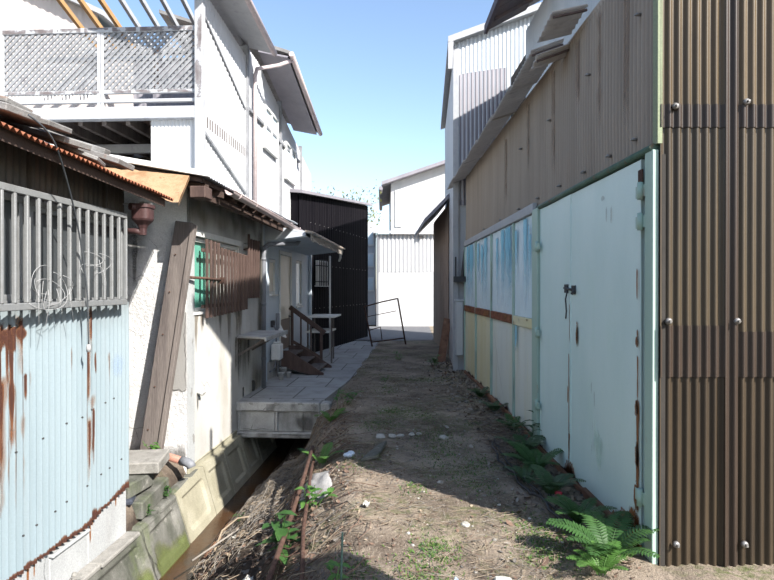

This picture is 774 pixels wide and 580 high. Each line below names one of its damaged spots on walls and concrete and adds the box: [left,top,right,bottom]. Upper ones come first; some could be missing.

damp [124,205,138,275]
corrosion [0,319,27,477]
corrosion [87,352,97,466]
corrosion [612,330,643,550]
corrosion [8,481,129,580]